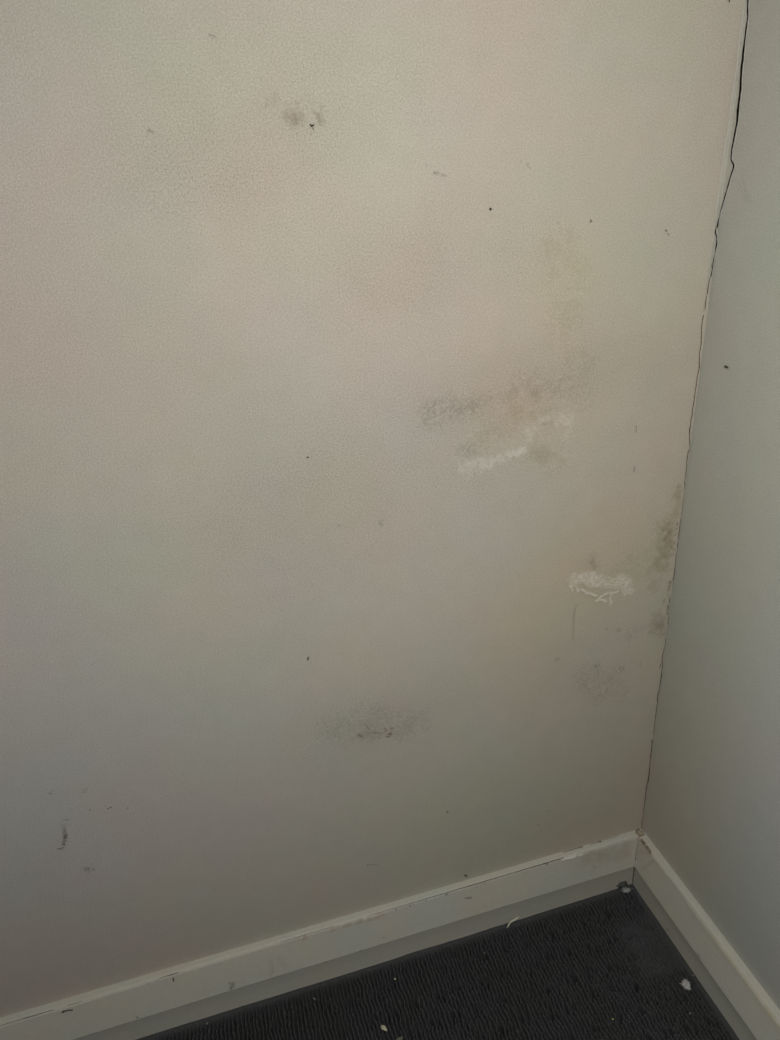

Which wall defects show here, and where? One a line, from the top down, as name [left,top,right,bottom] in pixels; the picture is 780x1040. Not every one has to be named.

leakage [414,220,601,478]
crack [373,0,751,915]